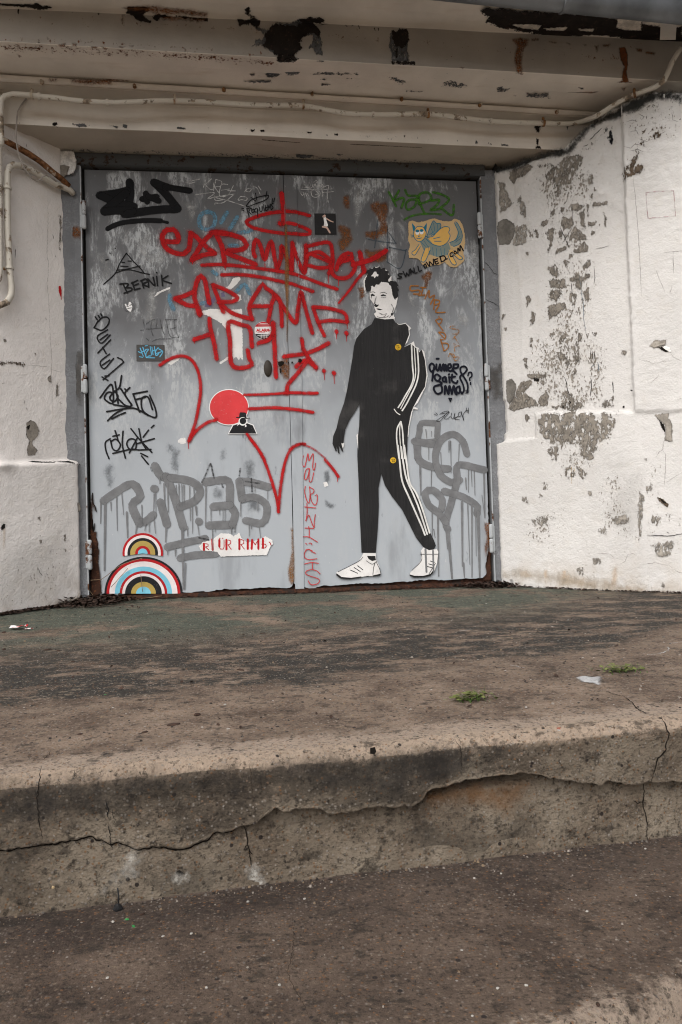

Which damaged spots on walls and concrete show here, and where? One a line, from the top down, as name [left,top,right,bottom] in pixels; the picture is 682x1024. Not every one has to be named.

corrosion [481,7,682,89]
peeling [497,142,625,480]
spalling [649,339,671,353]
spalling [26,420,40,455]
corrosion [90,493,101,596]
crack [0,752,255,869]
crack [591,692,670,840]